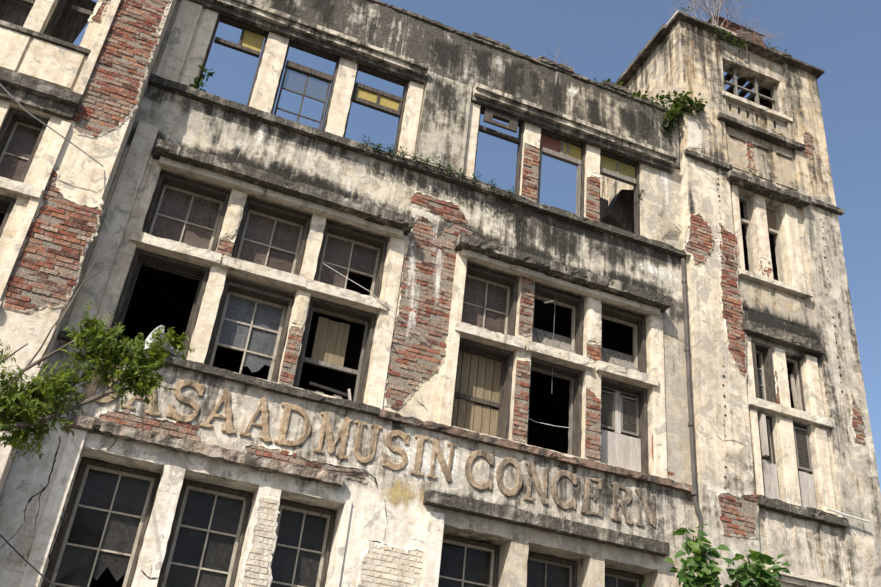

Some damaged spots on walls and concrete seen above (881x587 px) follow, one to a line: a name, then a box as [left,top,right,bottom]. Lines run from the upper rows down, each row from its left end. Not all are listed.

spalling [68,0,173,139]
leakage [200,111,363,200]
leakage [504,61,602,127]
leakage [619,107,654,138]
spalling [1,167,104,315]
spalling [383,191,476,410]
leakage [514,215,583,267]
leakage [597,245,682,293]
spalling [683,213,748,379]
crack [0,437,74,568]
peeling [239,495,280,587]
spalling [715,491,759,540]